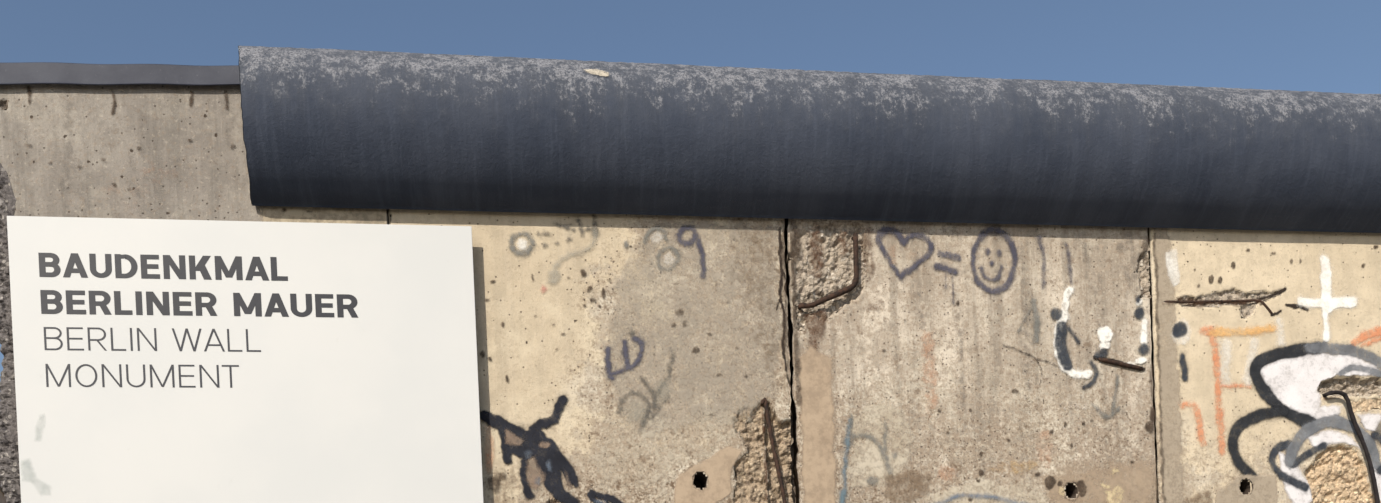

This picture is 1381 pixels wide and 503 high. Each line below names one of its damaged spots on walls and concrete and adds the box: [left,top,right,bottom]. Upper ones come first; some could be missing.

spalling [0,163,21,503]
spalling [731,398,793,503]
spalling [1304,375,1381,503]